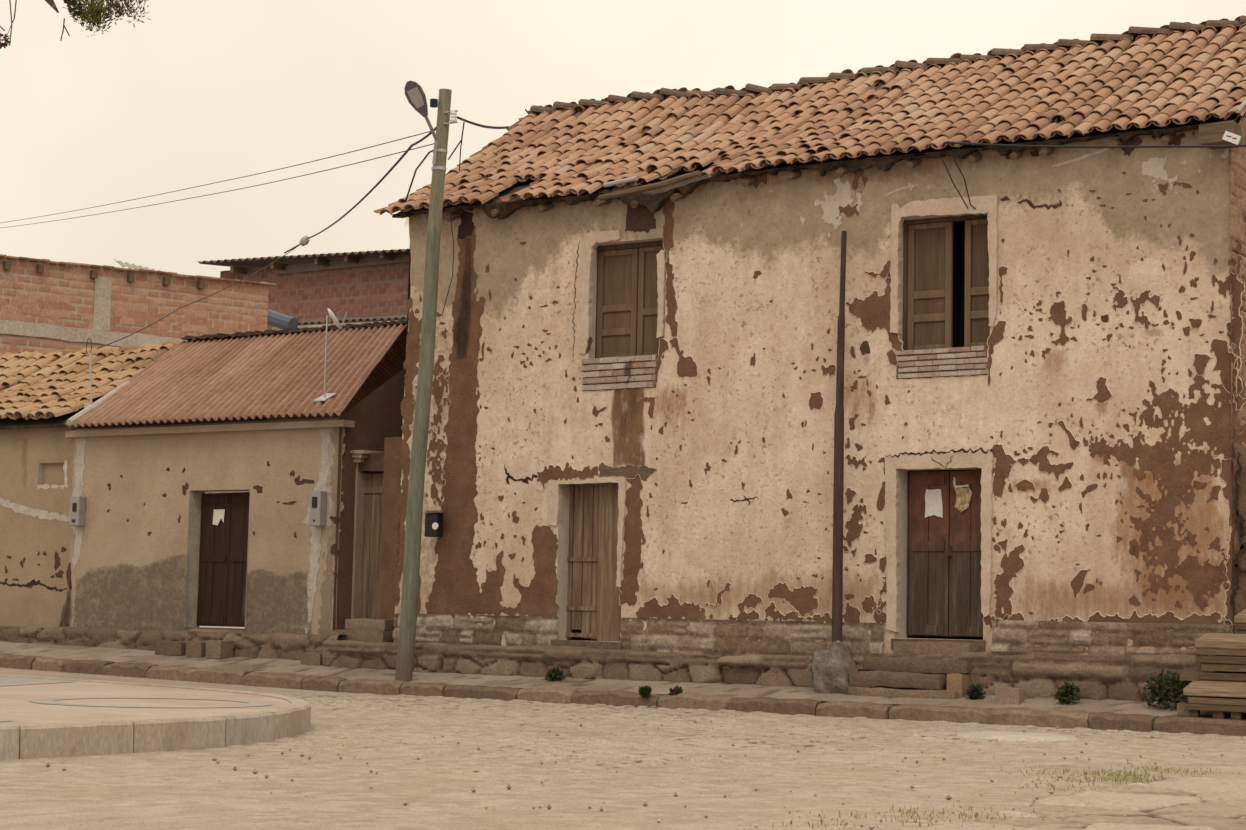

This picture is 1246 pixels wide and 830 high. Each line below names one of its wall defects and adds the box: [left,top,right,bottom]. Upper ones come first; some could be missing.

crack [0,579,67,592]
peeling [392,295,422,606]
peeling [417,211,559,620]
crack [504,466,540,484]
peeling [511,329,579,403]
peeling [536,455,599,490]
peeling [625,199,721,434]
peeling [619,414,887,625]
peeling [801,391,824,427]
peeling [792,343,837,380]
peeling [845,259,903,405]
peeling [983,160,1246,634]